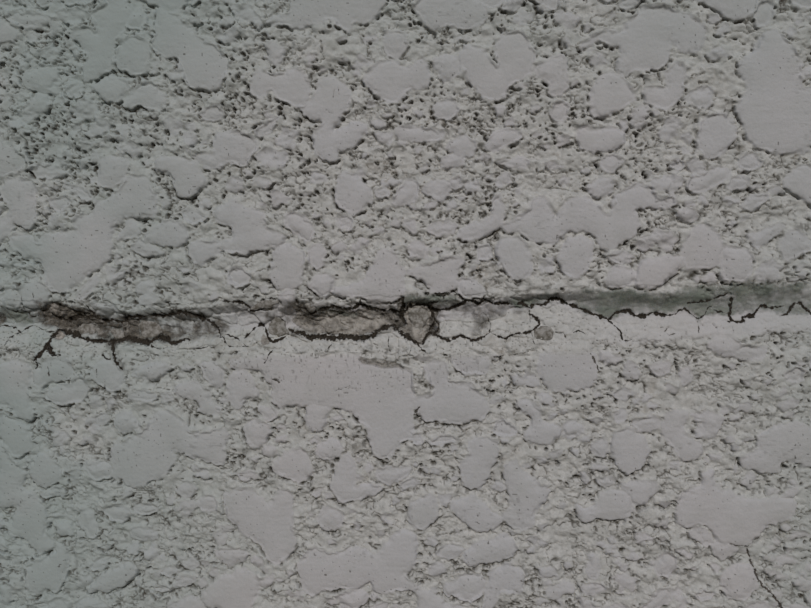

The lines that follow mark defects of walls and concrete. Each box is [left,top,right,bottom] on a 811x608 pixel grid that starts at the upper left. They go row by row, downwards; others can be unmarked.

spalling [41,302,162,340]
spalling [293,301,440,345]
crack [2,290,811,387]
crack [730,537,783,608]